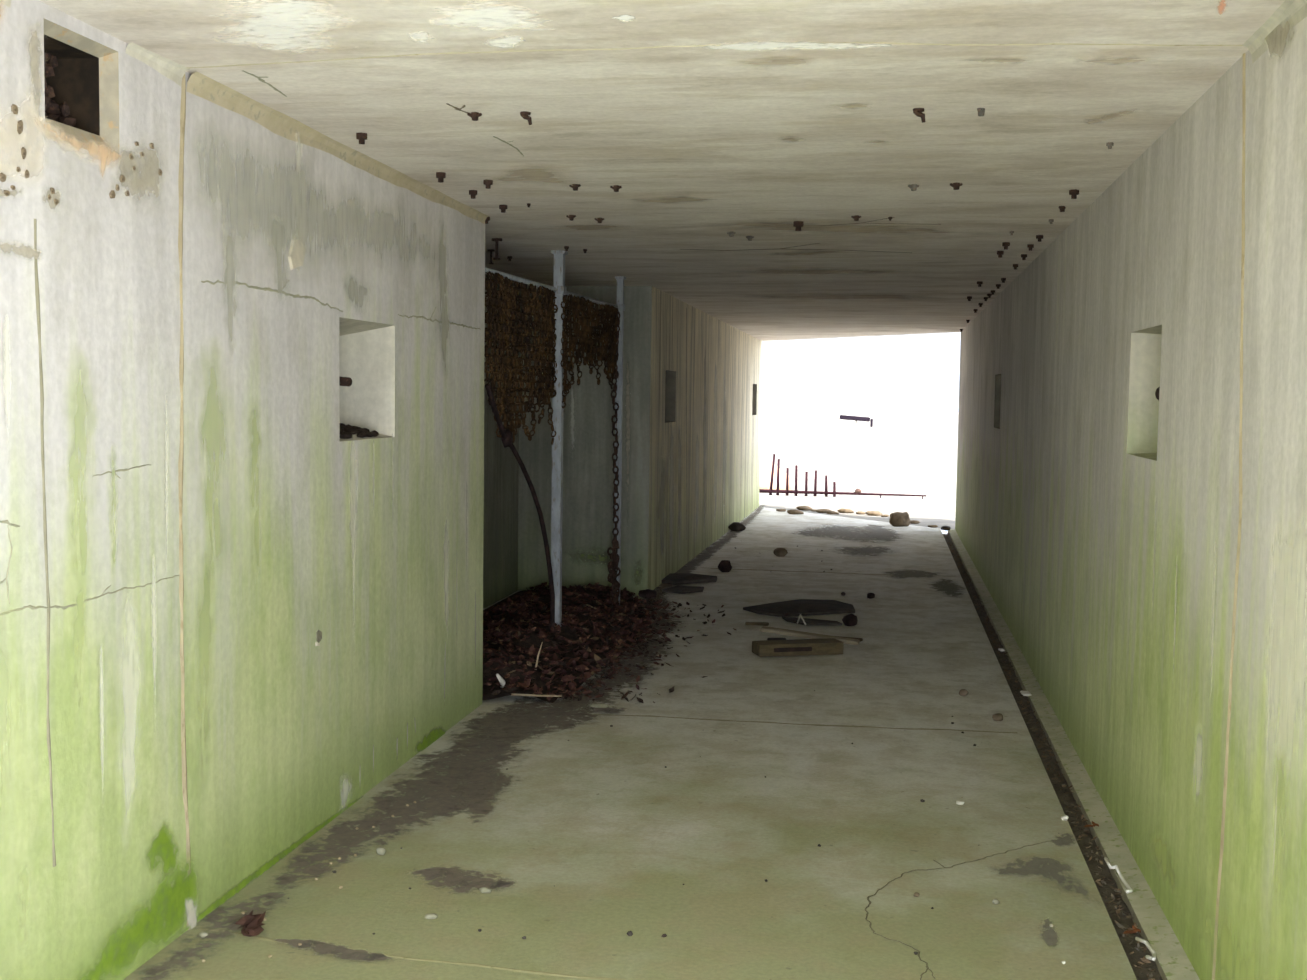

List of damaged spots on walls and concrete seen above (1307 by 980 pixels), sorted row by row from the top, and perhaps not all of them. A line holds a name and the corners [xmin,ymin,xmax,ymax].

water stain [410,2,538,48]
peeling [0,99,77,196]
spalling [43,187,60,208]
spalling [109,142,162,199]
water stain [209,146,448,355]
crack [201,280,343,312]
crack [92,464,150,479]
crack [0,520,181,615]
water stain [124,647,137,797]
water stain [994,834,1088,896]
water stain [186,901,196,928]
crack [865,839,1058,980]